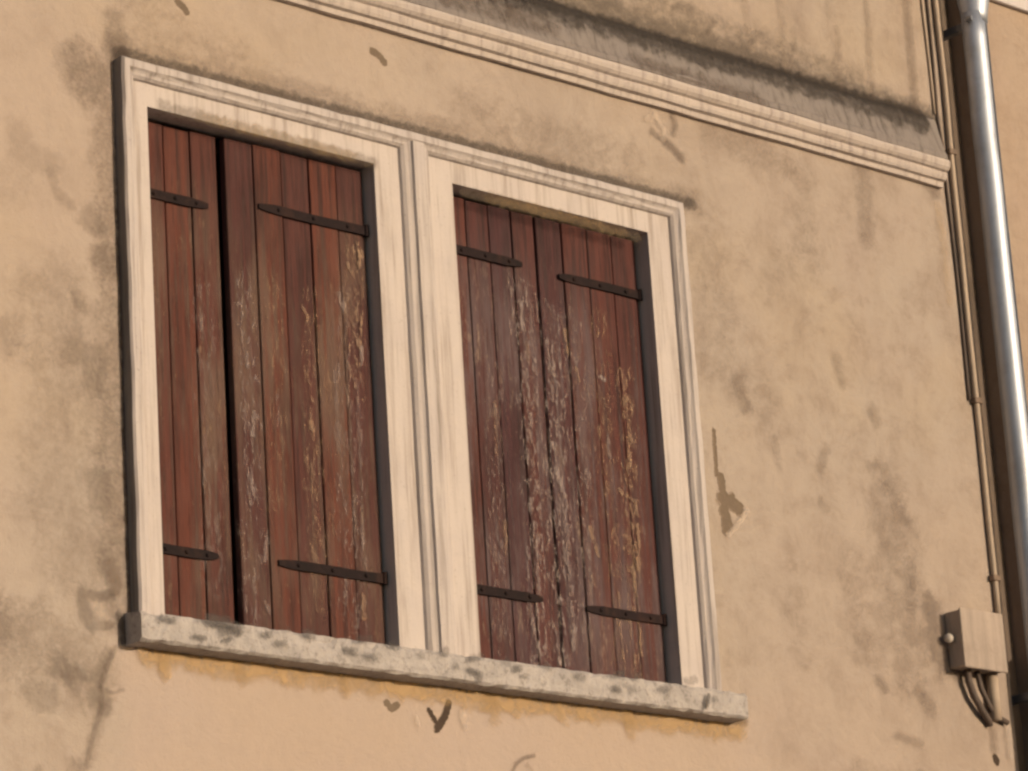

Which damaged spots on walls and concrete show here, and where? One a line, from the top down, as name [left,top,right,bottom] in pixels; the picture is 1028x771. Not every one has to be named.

leakage [521,0,926,120]
spalling [712,427,744,536]